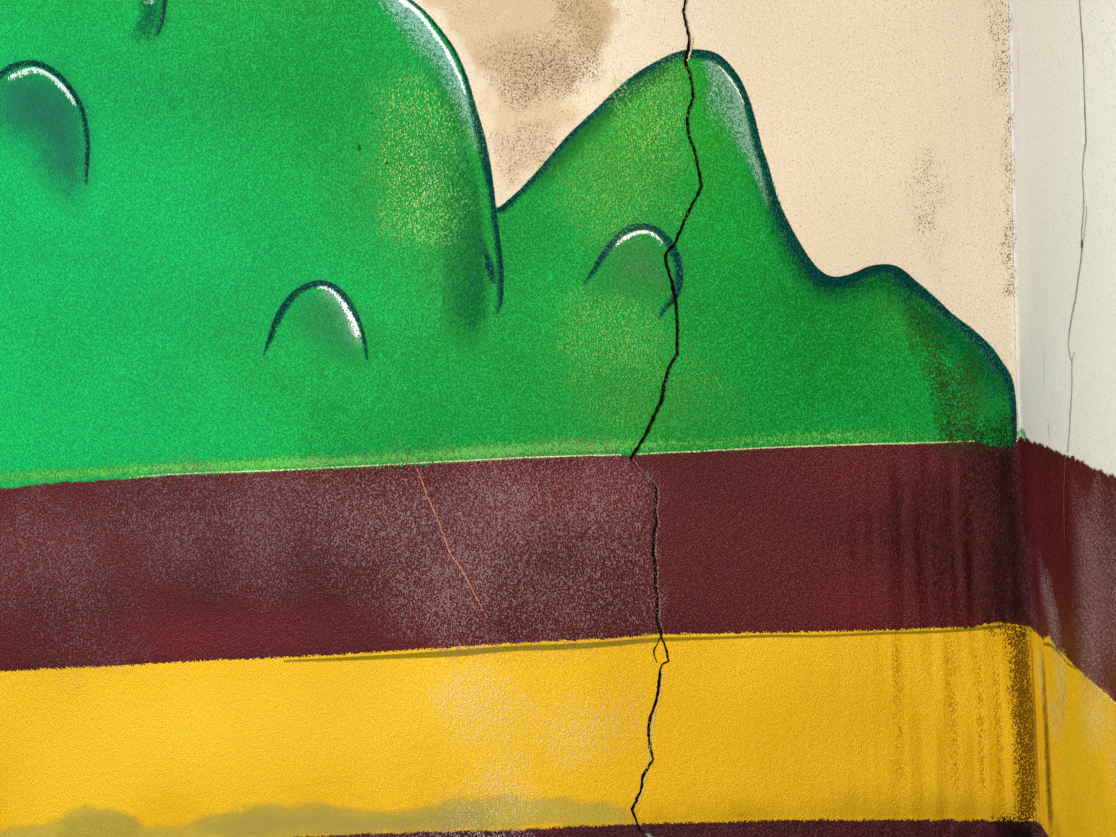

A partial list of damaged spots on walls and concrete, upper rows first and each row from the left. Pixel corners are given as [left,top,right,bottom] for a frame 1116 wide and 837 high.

crack [629,0,702,837]
crack [1064,0,1086,480]